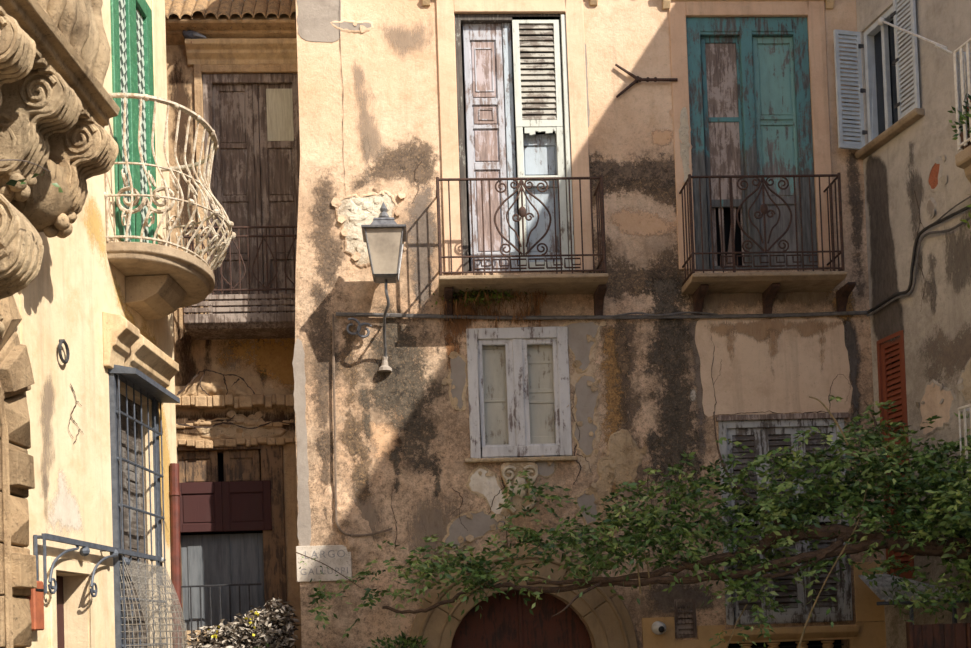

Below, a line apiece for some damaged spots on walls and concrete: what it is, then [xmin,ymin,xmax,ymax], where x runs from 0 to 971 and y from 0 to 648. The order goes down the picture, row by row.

flaking render [330,19,374,34]
flaking render [331,183,406,269]
water stain [353,64,437,308]
water stain [843,102,904,343]
crack [68,384,83,442]
crack [176,369,295,429]
water stain [359,304,445,497]
flaking render [562,315,647,538]
water stain [589,230,706,508]
water stain [710,318,861,431]
flaking render [915,357,971,439]
flaking render [442,465,513,556]